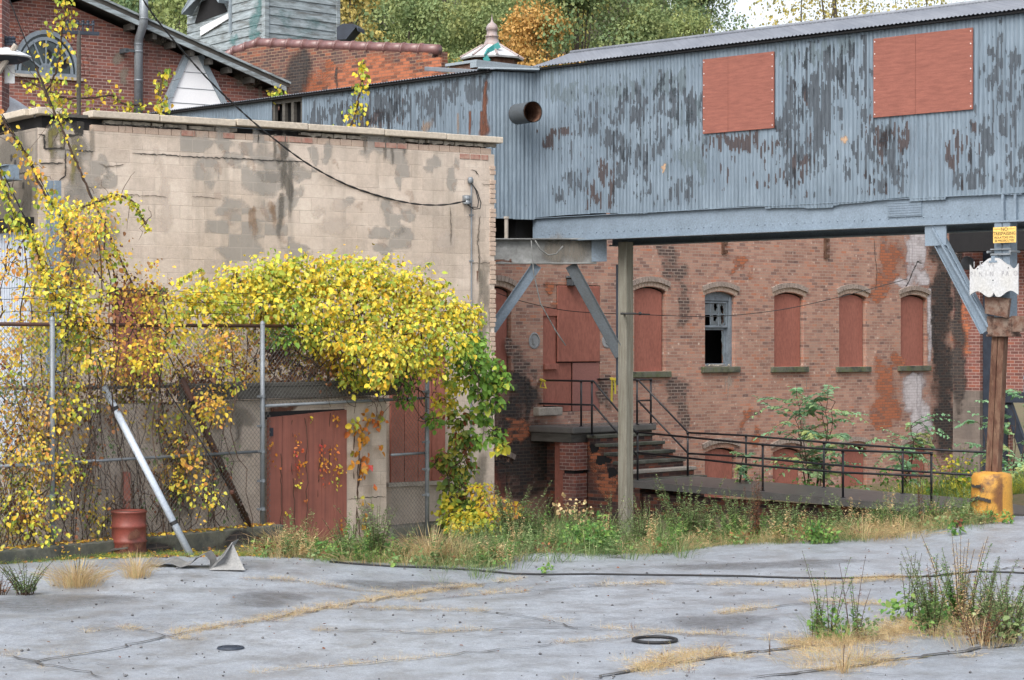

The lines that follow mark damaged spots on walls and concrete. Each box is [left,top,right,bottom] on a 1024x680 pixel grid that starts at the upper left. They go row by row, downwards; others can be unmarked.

crack [19,122,303,181]
leakage [274,134,293,232]
leakage [383,136,405,161]
peeling [302,52,490,191]
rust [469,81,489,136]
peeling [536,34,931,210]
peeling [944,18,1024,191]
spalling [870,353,905,430]
leakage [894,234,967,457]